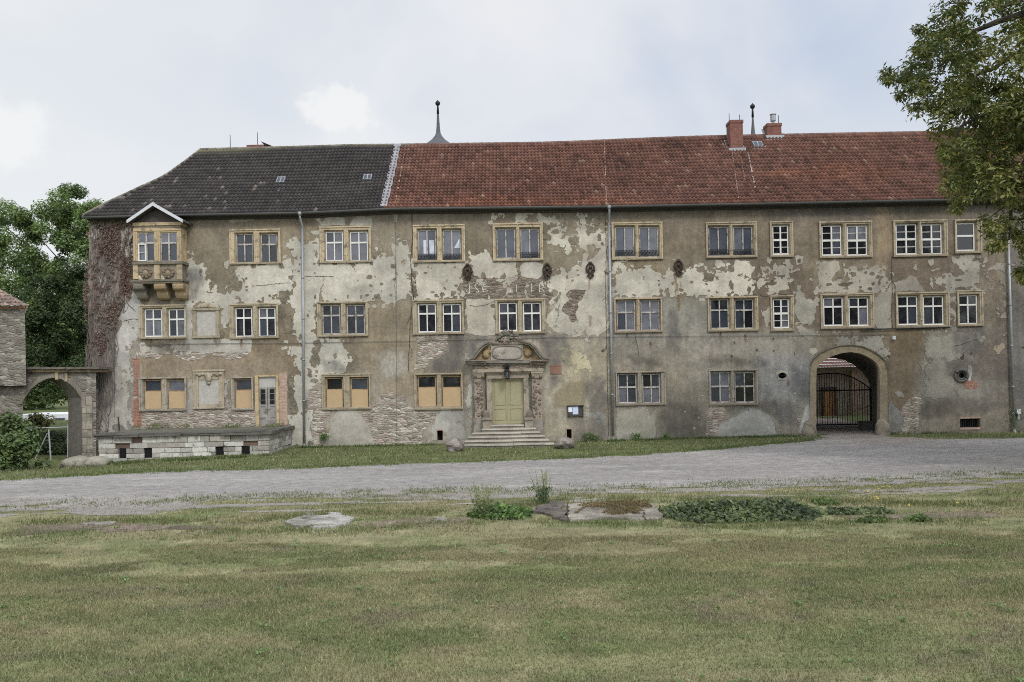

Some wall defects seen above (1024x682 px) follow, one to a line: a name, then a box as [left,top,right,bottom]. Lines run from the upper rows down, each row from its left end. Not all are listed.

peeling [88,213,1015,446]